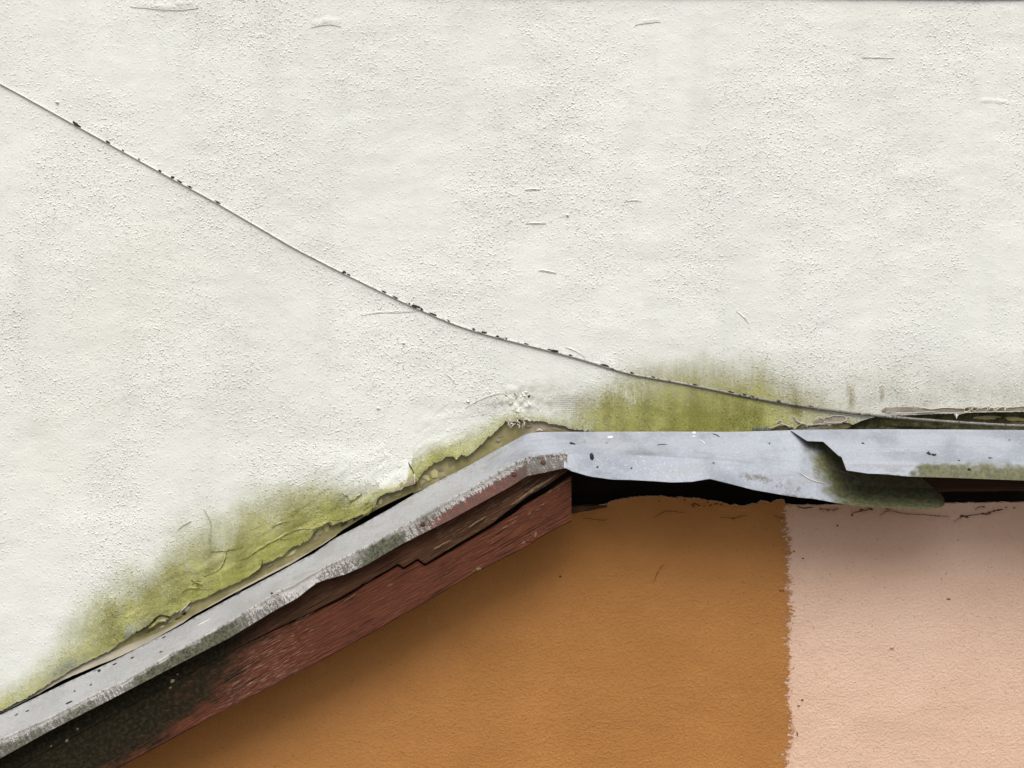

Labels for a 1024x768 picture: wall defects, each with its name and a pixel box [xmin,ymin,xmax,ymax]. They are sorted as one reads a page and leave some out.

spalling [770,406,1024,430]
crack [342,482,379,516]
crack [179,513,333,592]